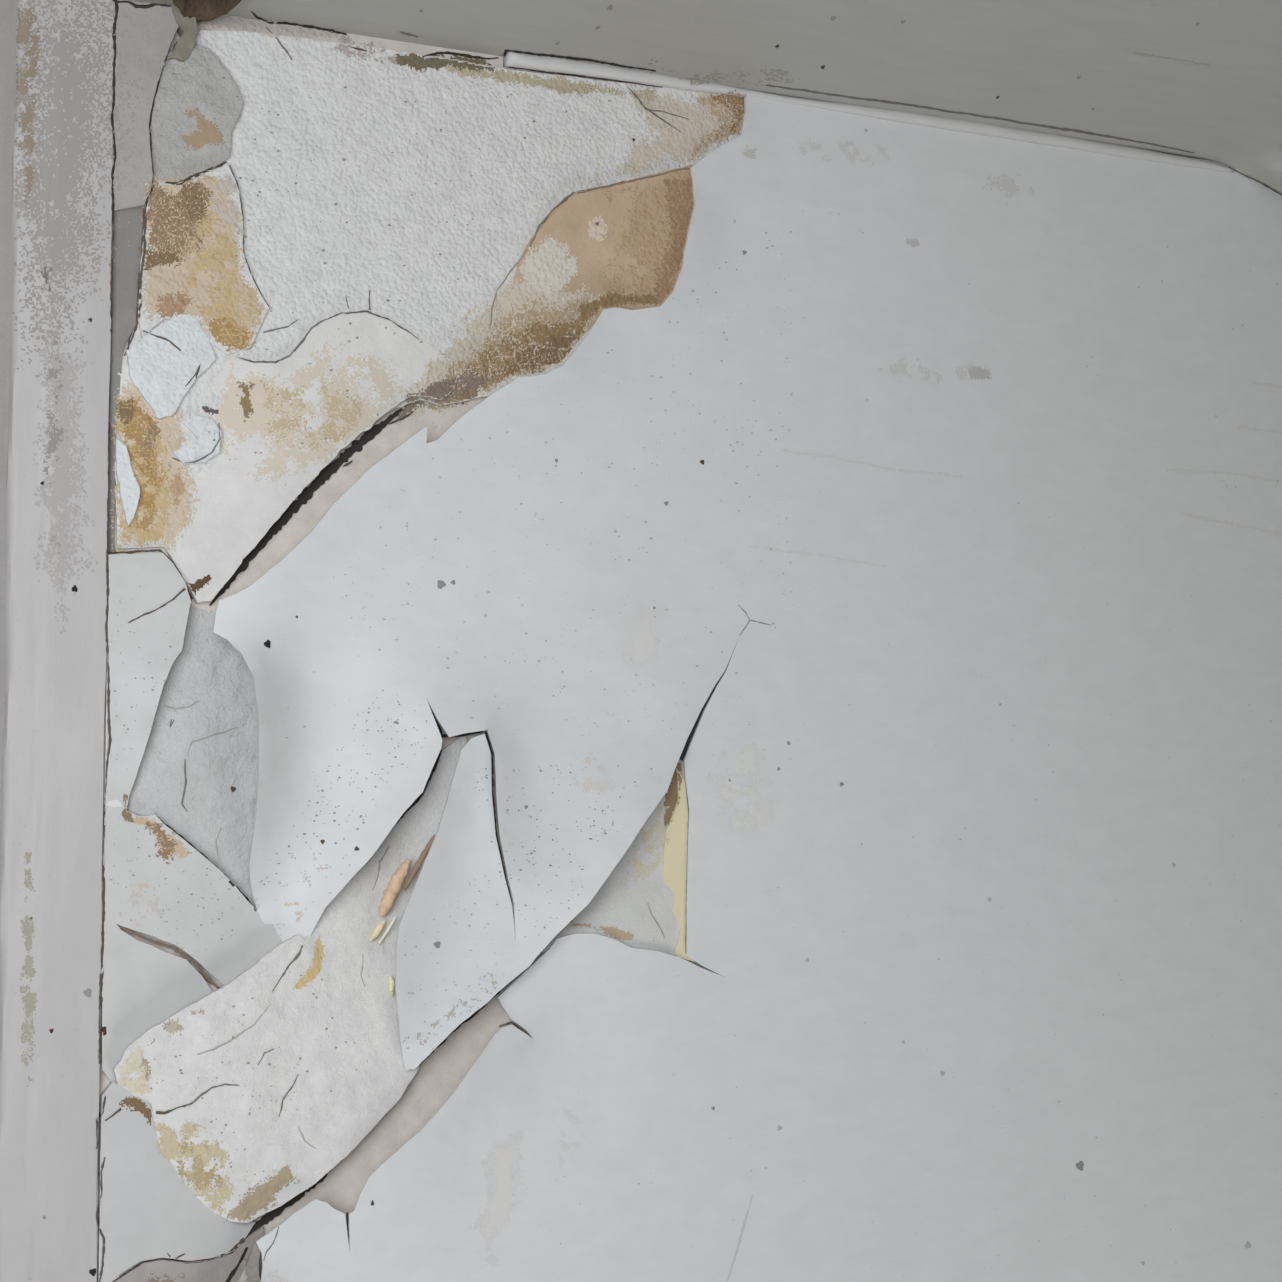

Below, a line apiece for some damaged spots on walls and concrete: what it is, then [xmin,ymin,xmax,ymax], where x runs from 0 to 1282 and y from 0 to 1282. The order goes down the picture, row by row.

crack [400,32,687,132]
crack [766,85,1193,153]
crack [1229,167,1282,195]
leakage [13,0,799,633]
spalling [101,3,745,1223]
peeling [230,1243,260,1282]